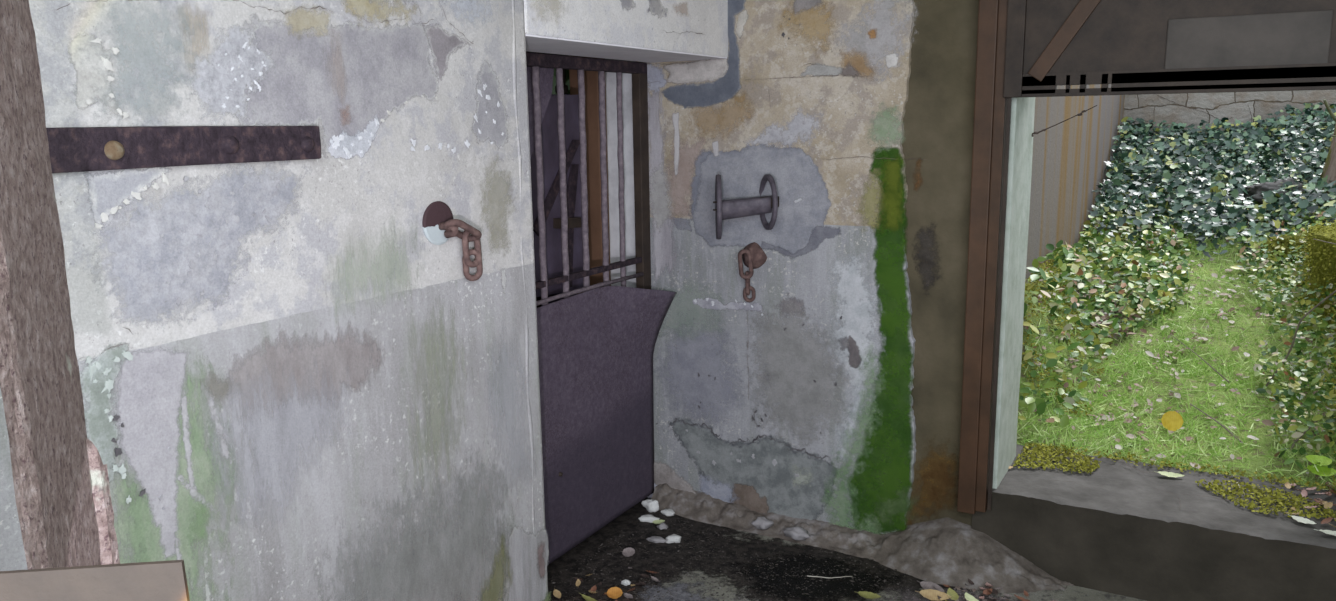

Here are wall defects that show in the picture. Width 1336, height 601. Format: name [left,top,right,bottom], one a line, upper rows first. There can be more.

crack [233,0,330,14]
water stain [861,162,902,228]
peeling [80,344,133,482]
water stain [178,393,219,511]
water stain [206,326,380,510]
water stain [665,326,736,418]
spalling [654,402,837,520]
water stain [753,255,911,534]